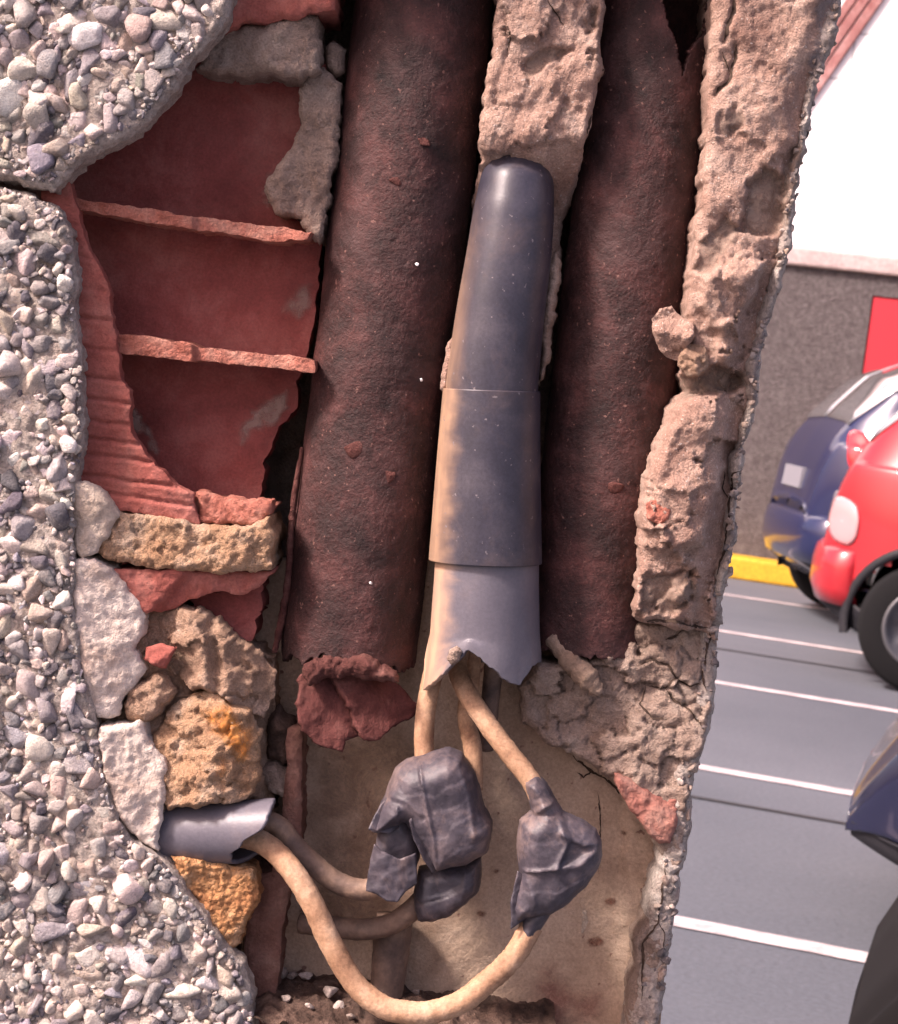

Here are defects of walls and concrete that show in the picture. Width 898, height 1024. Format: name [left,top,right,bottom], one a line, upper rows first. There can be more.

spalling [526,49,561,73]
spalling [721,114,742,133]
spalling [697,146,802,271]
spalling [675,366,750,398]
spalling [646,499,671,524]
spalling [641,572,698,615]
spalling [72,481,177,851]
crack [517,619,717,1024]